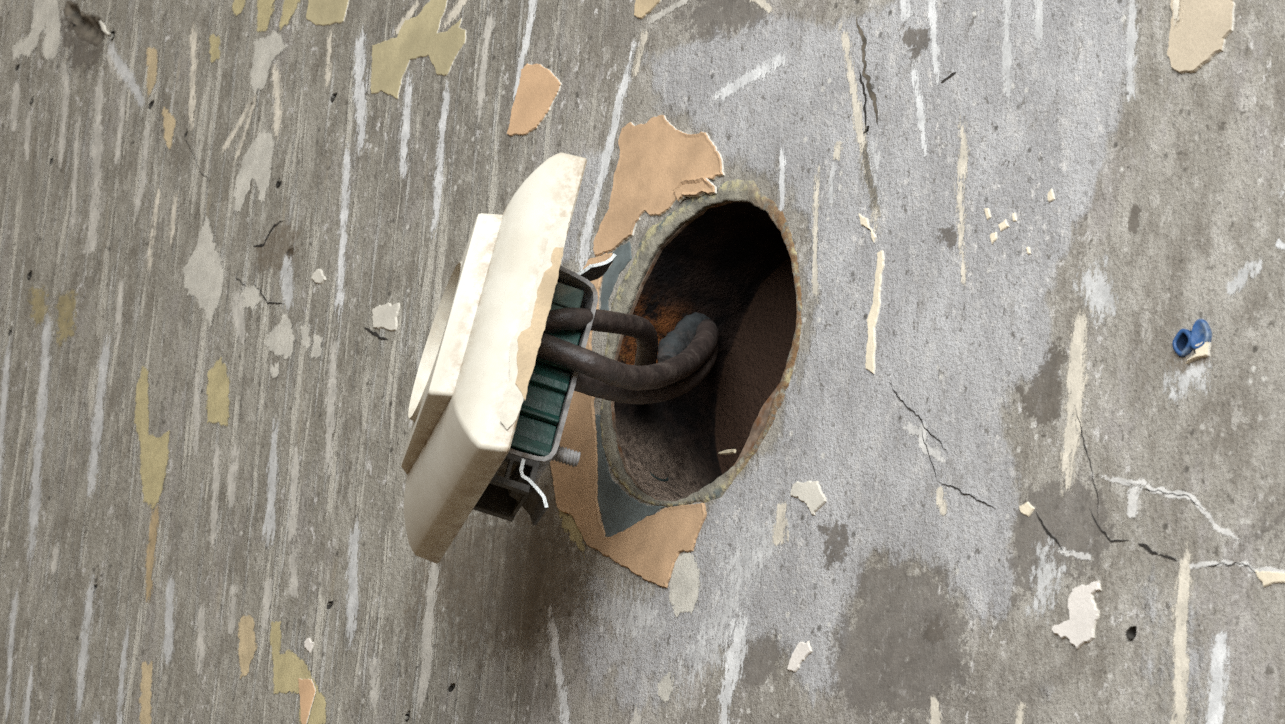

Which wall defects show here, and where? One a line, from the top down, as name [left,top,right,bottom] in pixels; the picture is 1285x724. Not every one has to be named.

peeling [370,0,467,99]
peeling [634,0,662,19]
peeling [1167,0,1235,74]
peeling [507,64,562,137]
peeling [550,115,802,588]
crack [889,382,1285,587]